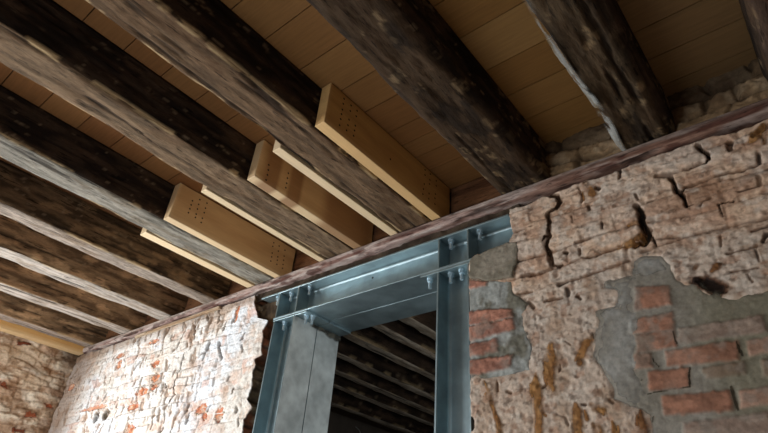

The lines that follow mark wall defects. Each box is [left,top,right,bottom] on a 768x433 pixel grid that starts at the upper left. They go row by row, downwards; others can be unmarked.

crack [542,195,563,268]
crack [636,207,657,249]
crack [672,179,691,208]
spalling [594,256,768,433]